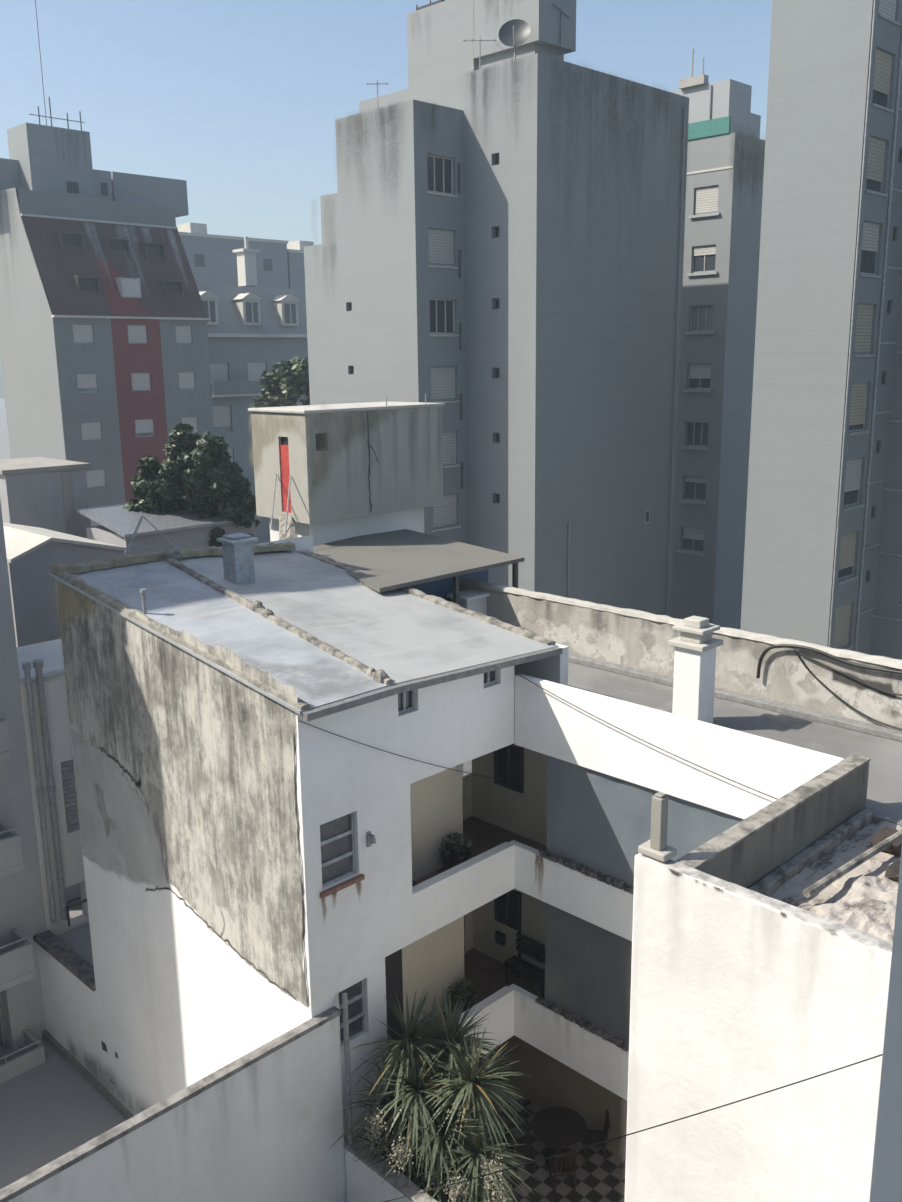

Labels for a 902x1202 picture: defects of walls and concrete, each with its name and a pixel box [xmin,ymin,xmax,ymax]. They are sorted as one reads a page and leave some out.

crack [367,413,378,511]
peeling [515,607,680,676]
peeling [715,646,902,727]
damp [57,583,309,1007]
crack [99,729,308,1006]